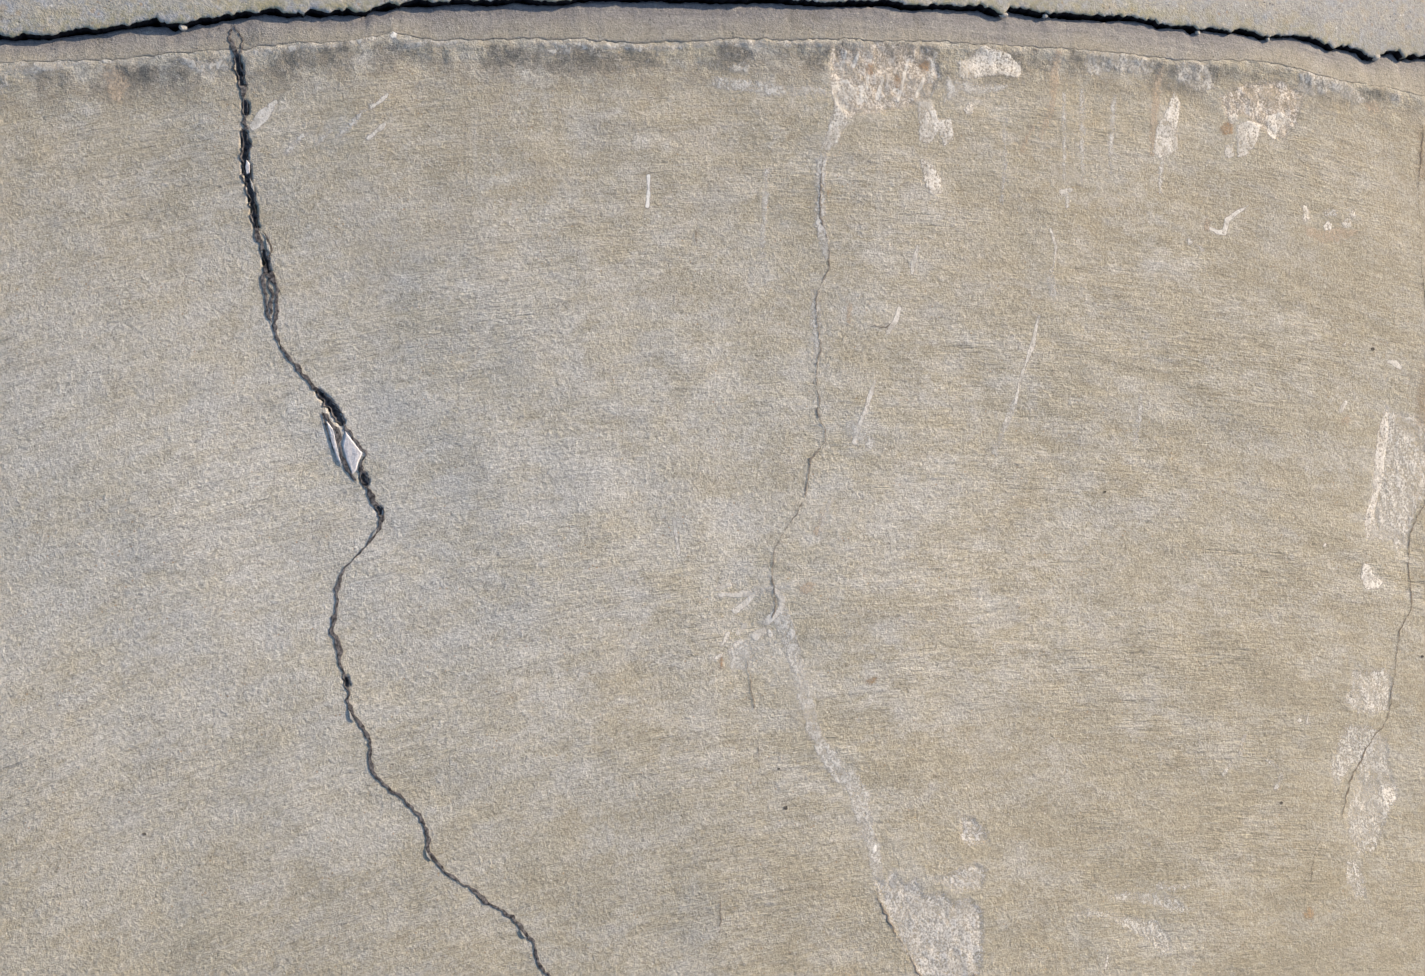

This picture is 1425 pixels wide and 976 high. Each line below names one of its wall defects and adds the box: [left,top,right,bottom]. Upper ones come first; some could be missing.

crack [0,0,1373,61]
crack [1380,51,1425,61]
crack [228,25,551,976]